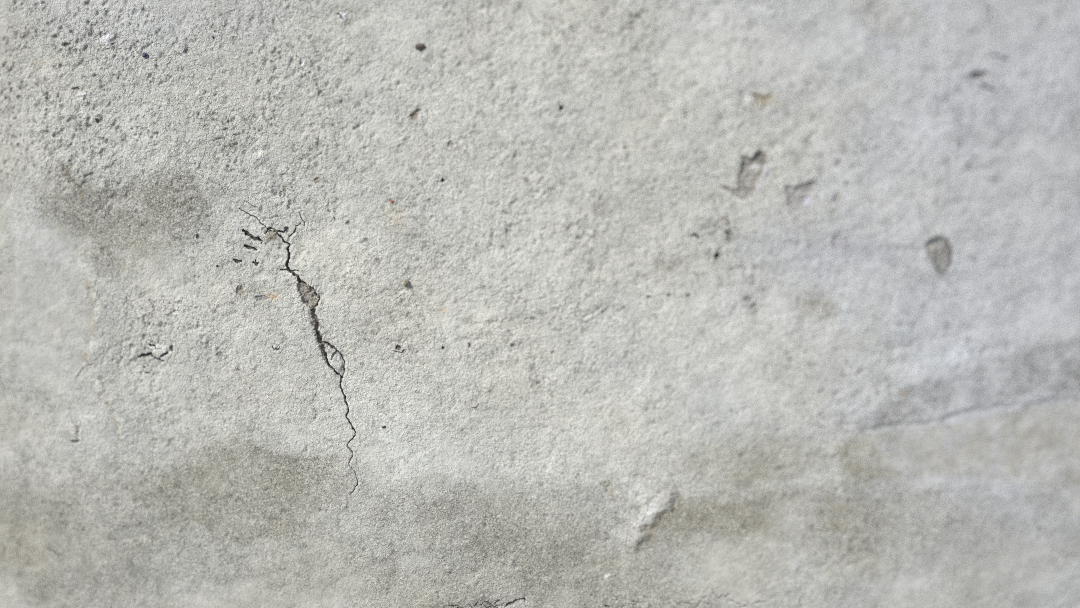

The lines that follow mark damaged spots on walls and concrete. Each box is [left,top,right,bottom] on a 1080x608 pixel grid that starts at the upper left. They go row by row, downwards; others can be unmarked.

crack [187,165,362,499]
hole [913,194,958,282]